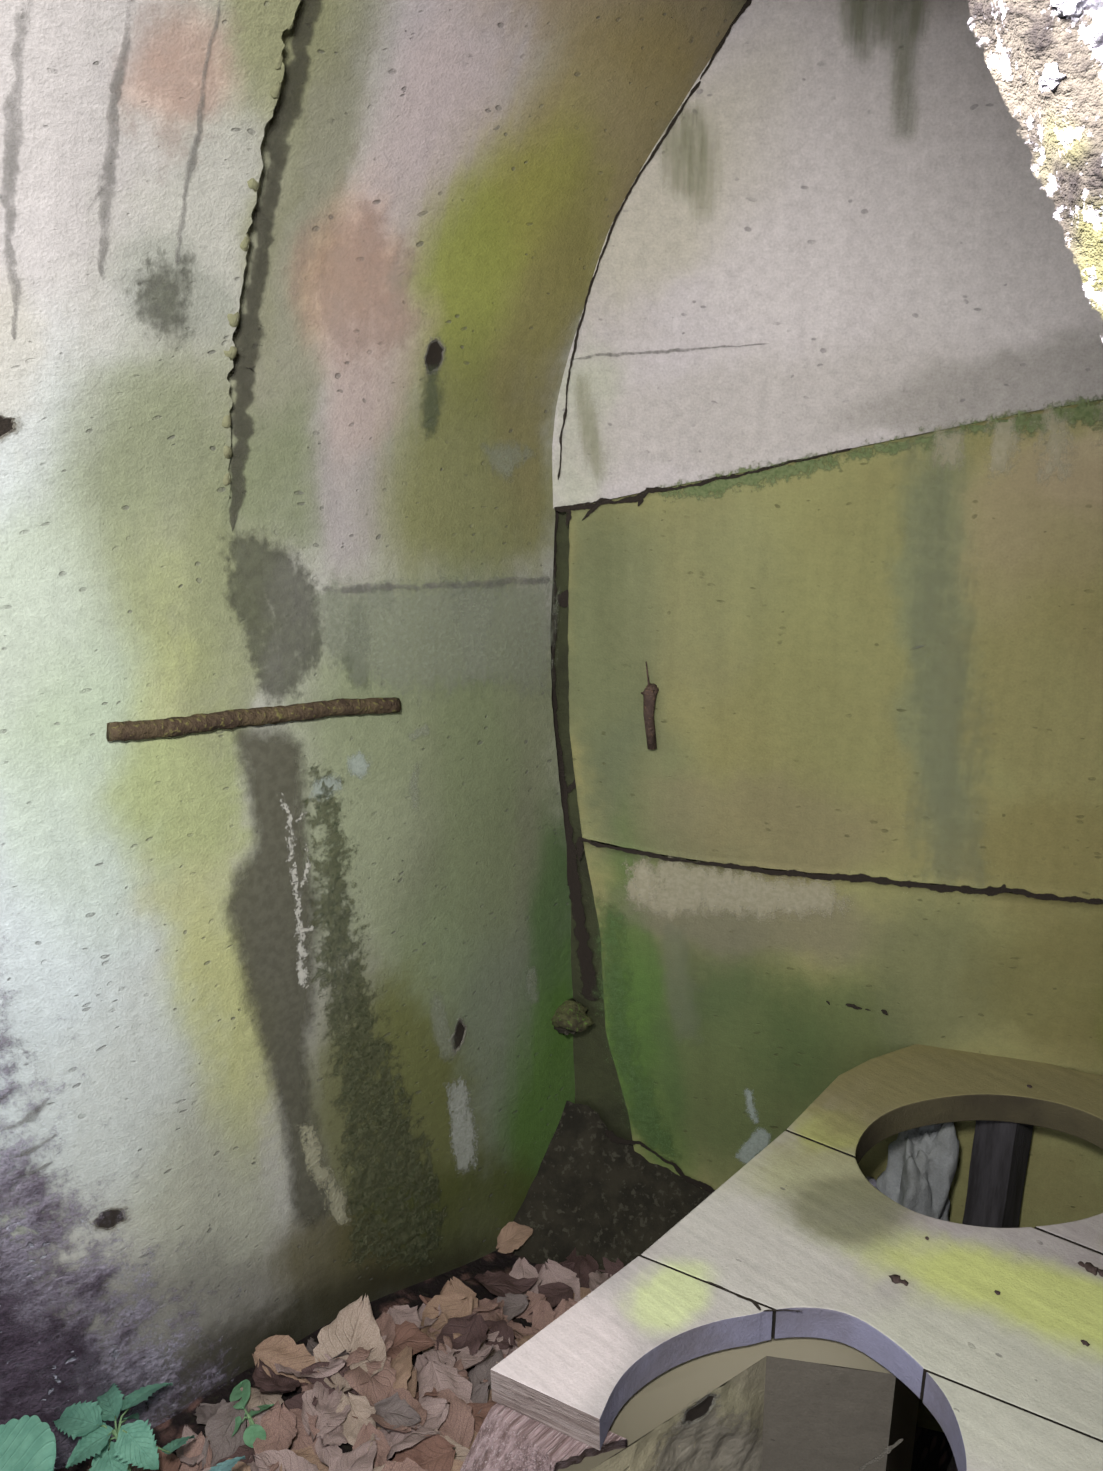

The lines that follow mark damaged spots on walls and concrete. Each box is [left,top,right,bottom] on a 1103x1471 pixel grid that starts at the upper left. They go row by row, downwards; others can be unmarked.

crack [183,8,220,197]
water stain [991,420,1018,471]
water stain [228,537,322,696]
crack [343,583,393,592]
crack [428,448,1103,1001]
water stain [228,732,341,1223]
crack [826,1001,888,1015]